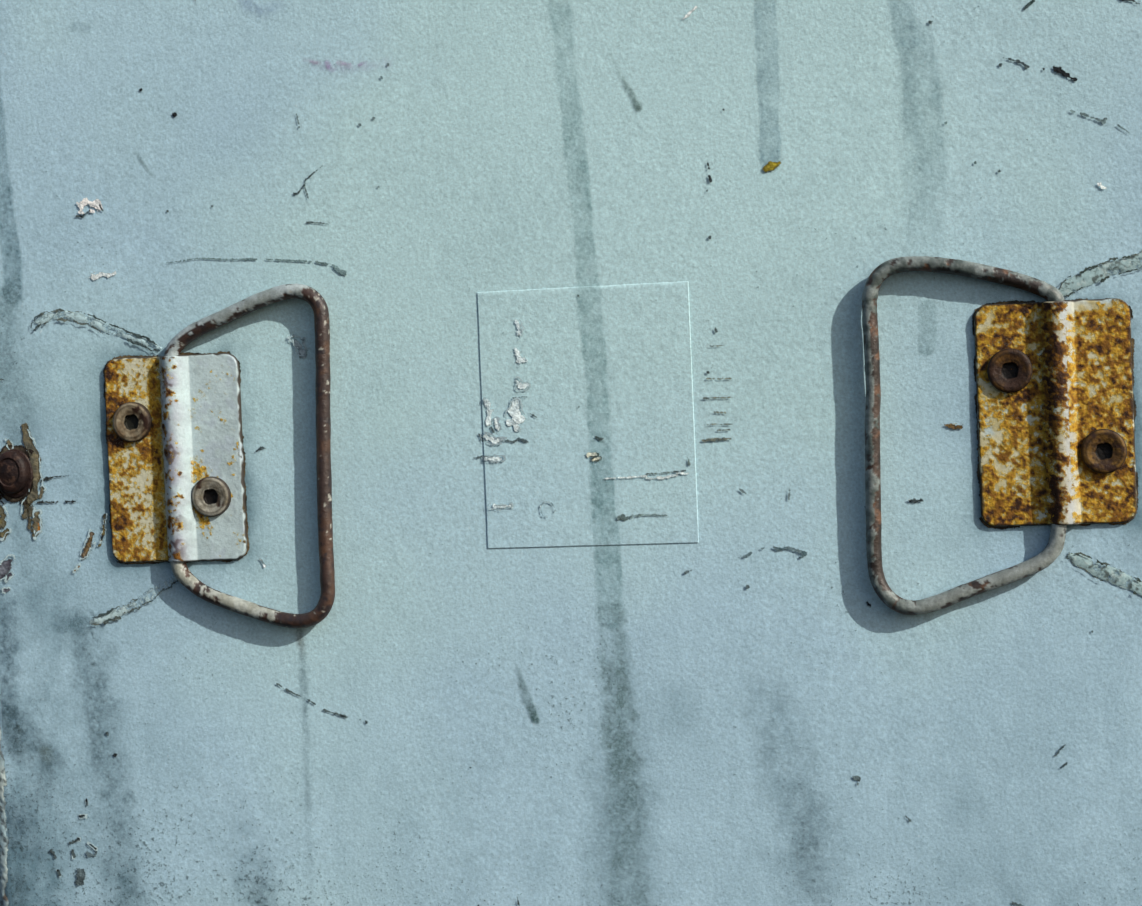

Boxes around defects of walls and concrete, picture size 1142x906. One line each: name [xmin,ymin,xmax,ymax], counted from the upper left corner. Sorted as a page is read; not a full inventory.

peeling [0,423,47,541]
rust [104,357,242,562]
rust [975,299,1137,526]
peeling [0,554,15,594]
peeling [72,513,107,573]